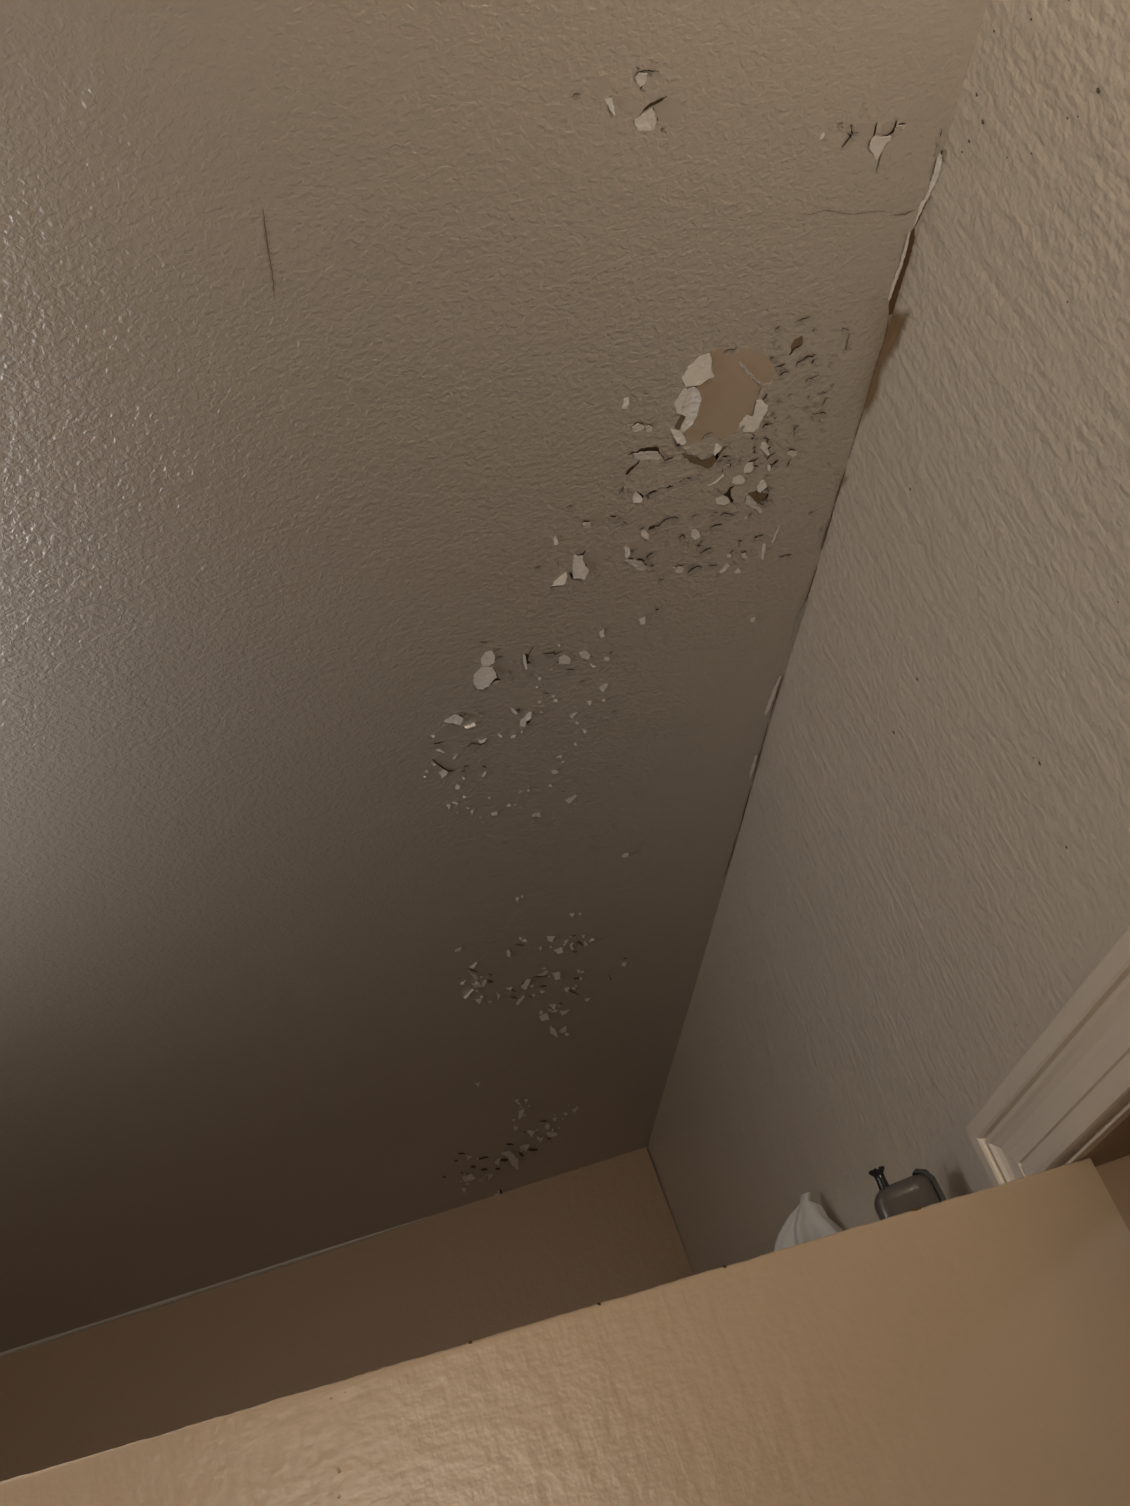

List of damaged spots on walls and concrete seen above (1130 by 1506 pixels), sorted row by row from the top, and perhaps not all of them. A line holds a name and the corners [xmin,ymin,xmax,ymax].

peeling [572,67,682,133]
peeling [820,103,906,174]
peeling [535,316,855,592]
peeling [424,629,633,824]
peeling [456,935,595,1037]
peeling [442,1099,578,1196]